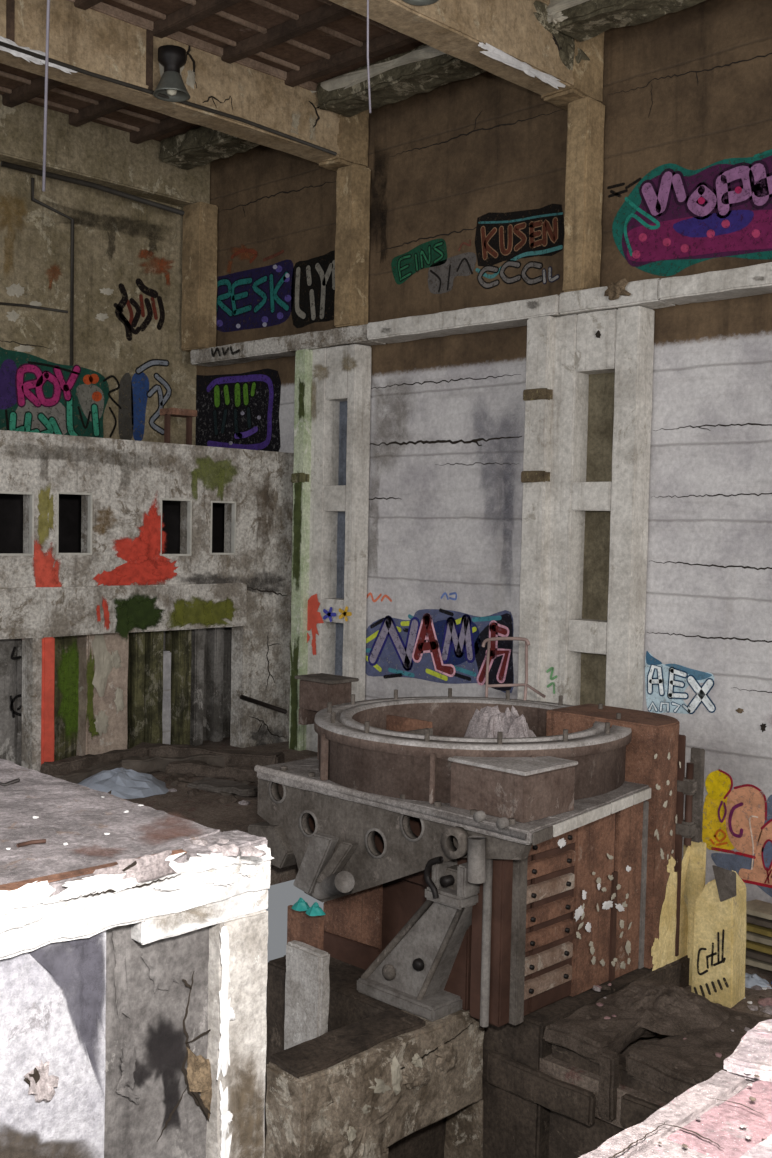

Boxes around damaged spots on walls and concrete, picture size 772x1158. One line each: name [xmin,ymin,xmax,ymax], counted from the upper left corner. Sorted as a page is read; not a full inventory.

crack [653,423,772,431]
crack [652,491,772,499]
crack [653,561,772,570]
damp [115,598,185,640]
peeling [0,844,274,933]
damp [120,1020,186,1128]